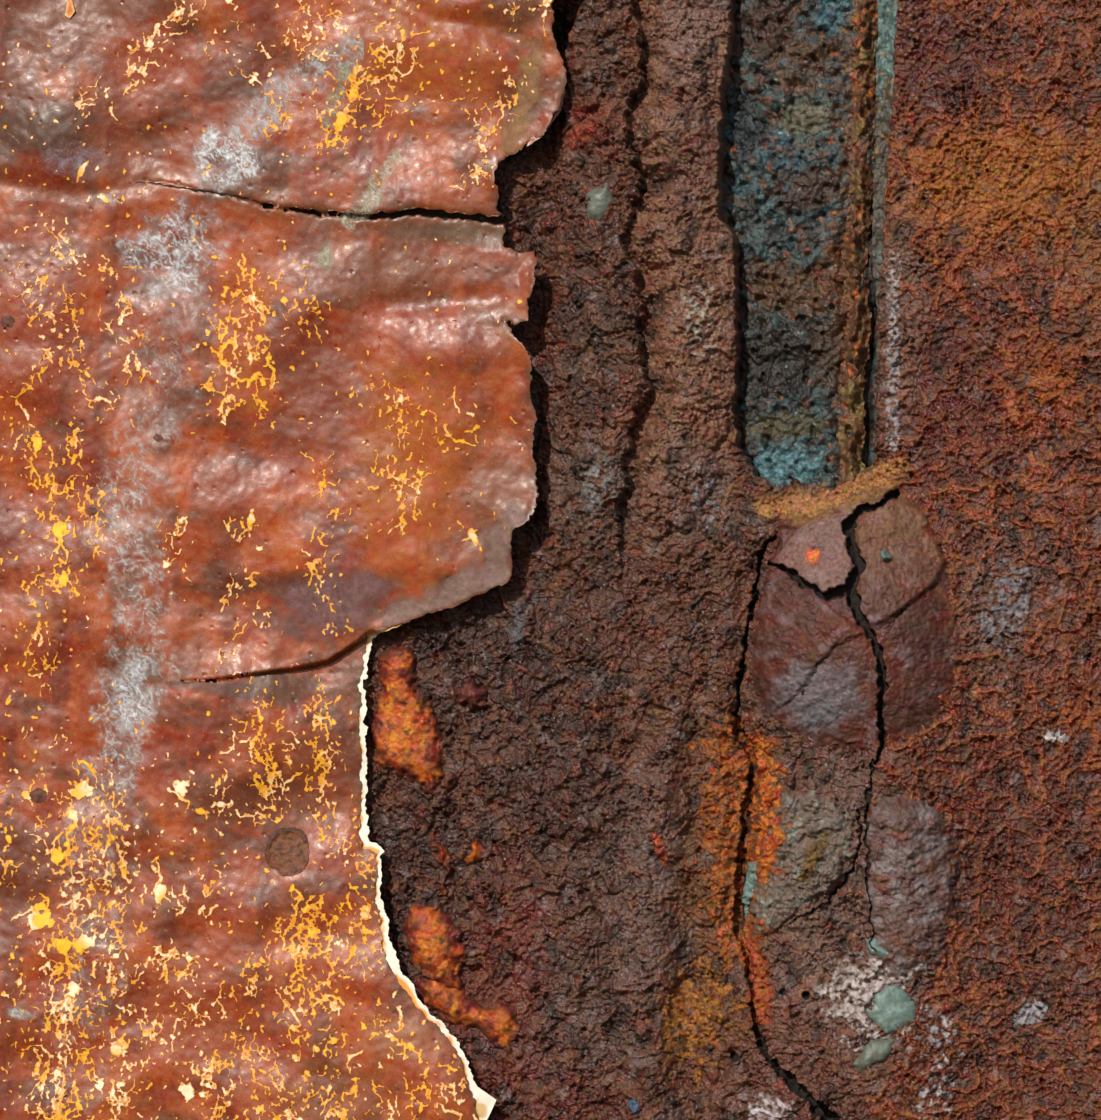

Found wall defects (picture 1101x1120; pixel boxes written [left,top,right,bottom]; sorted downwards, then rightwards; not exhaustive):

peeling [71,0,206,129]
crack [129,181,505,226]
peeling [204,0,552,190]
rust [920,130,1097,220]
peeling [192,239,340,429]
peeling [0,183,166,740]
crack [180,673,261,683]
peeling [0,564,478,1120]
rust [367,646,446,798]
rust [401,839,522,1055]
rust [645,715,793,1084]
crack [731,489,928,1120]